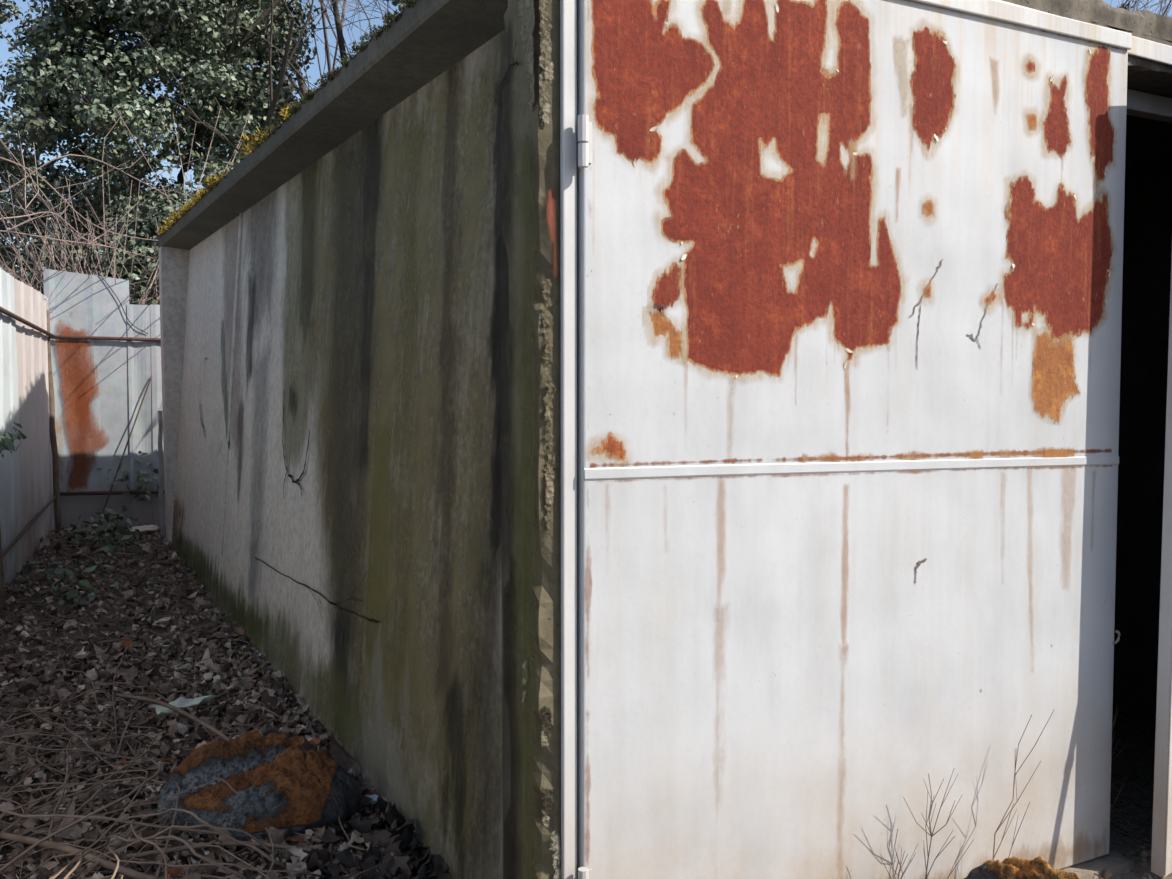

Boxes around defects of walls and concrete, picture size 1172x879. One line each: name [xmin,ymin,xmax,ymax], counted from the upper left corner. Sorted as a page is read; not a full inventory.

rust [55,322,109,489]
leakage [177,535,267,634]
leakage [219,189,277,539]
crack [282,389,310,495]
leakage [301,162,316,336]
crack [255,557,381,624]
leakage [332,119,389,693]
leakage [438,588,466,878]
leakage [479,28,519,879]
rust [591,0,902,378]
rust [983,41,1127,424]